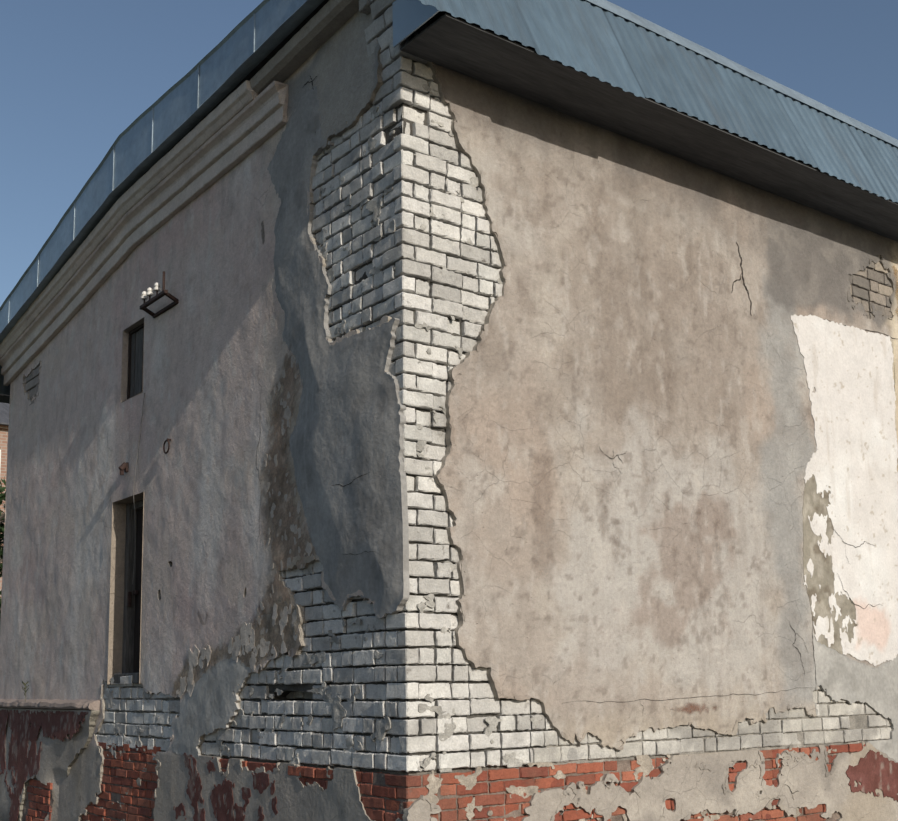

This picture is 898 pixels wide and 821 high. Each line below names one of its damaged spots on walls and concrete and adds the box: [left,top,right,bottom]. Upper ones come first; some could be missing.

crack [731,242,752,316]
peeling [847,255,894,320]
peeling [22,360,41,406]
spalling [82,0,677,821]
peeling [790,314,898,666]
peeling [0,709,88,821]
spalling [530,686,892,787]
spalling [722,760,746,795]
spalling [680,796,840,821]
peeling [846,750,898,801]